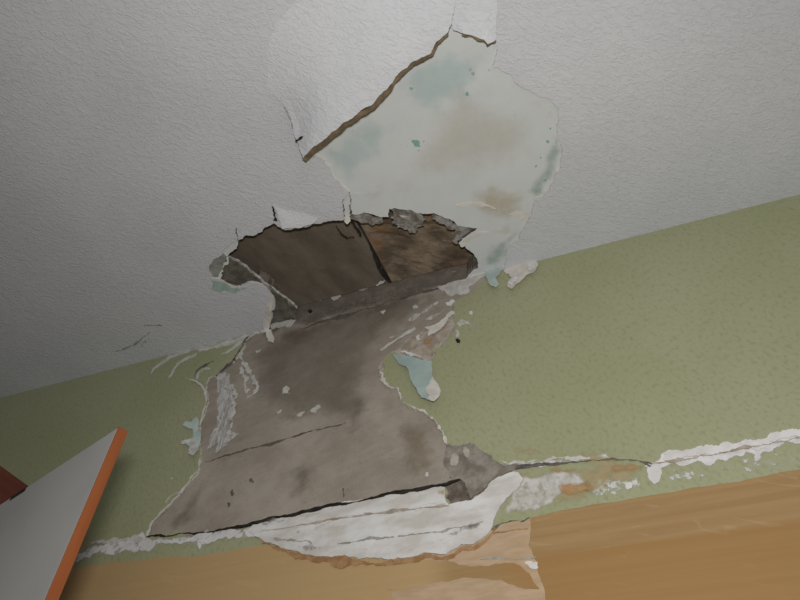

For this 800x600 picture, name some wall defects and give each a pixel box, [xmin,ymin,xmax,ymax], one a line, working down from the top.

spalling [146,0,640,537]
crack [205,422,346,462]
crack [516,436,800,469]
damp [501,454,635,498]
peeling [670,471,704,480]
crack [147,478,486,544]